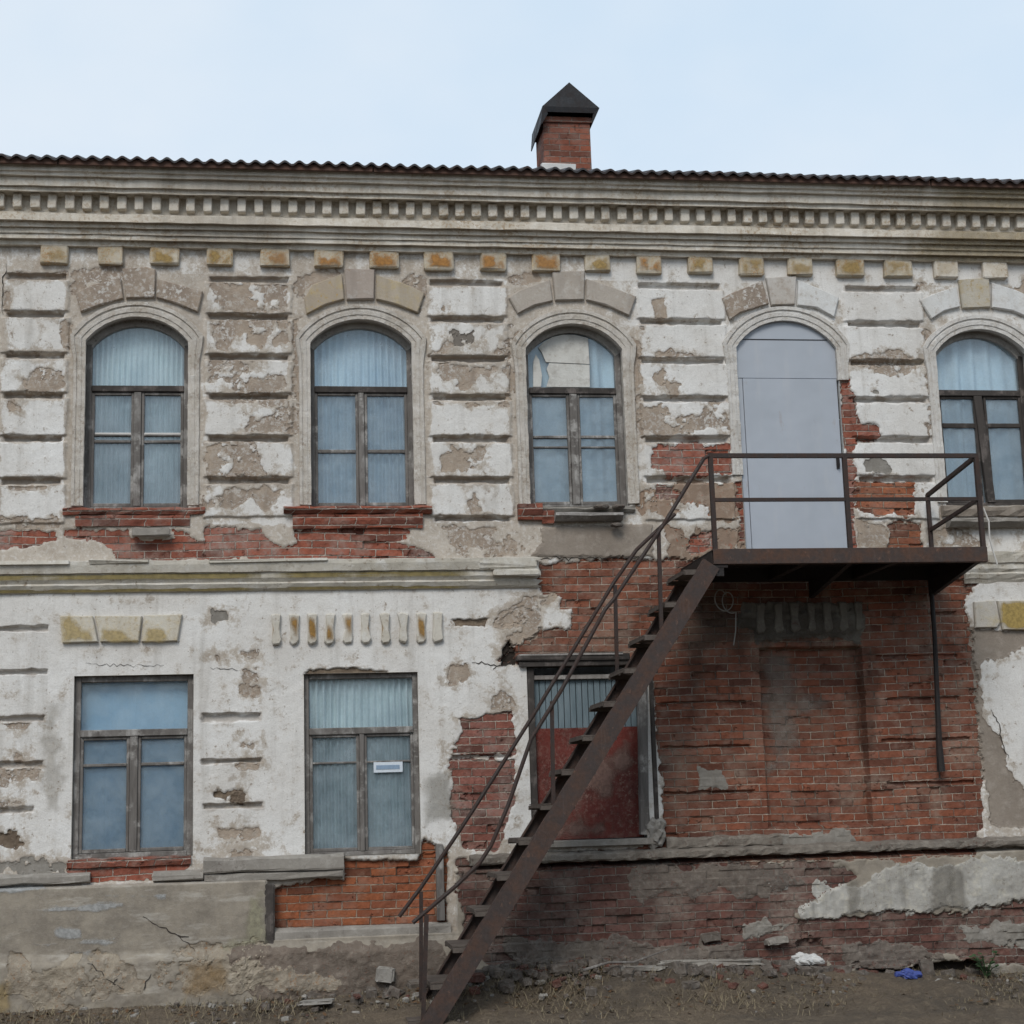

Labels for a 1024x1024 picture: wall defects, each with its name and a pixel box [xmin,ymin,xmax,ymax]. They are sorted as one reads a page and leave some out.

peeling [651,297,667,324]
peeling [197,268,341,512]
spalling [840,349,980,548]
spalling [439,326,746,665]
spalling [0,513,435,560]
peeling [210,608,228,624]
peeling [239,649,261,699]
spalling [213,789,246,805]
spalling [275,690,517,928]
spalling [482,575,1024,972]
crack [143,916,192,948]
peeling [0,939,267,1011]